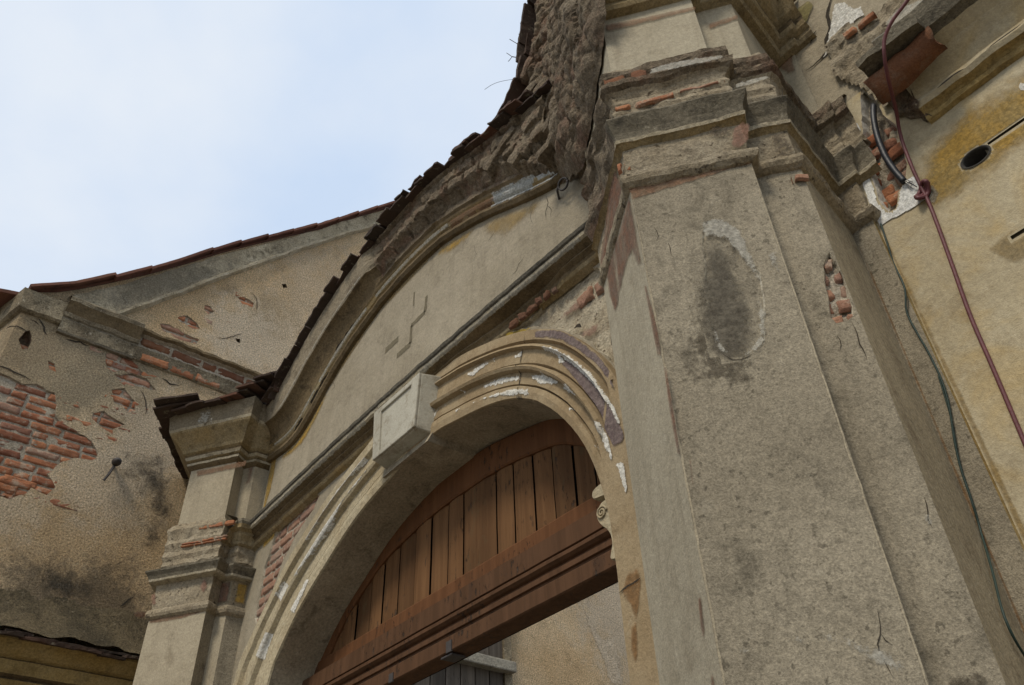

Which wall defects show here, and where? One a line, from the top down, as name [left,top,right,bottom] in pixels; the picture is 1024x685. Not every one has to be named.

peeling [824,0,922,56]
flaking render [856,90,925,225]
peeling [417,237,581,374]
flaking render [506,267,615,365]
water stain [701,249,750,357]
flaking render [823,252,853,323]
flaking render [0,305,252,511]
peeling [460,374,575,403]
peeling [542,346,620,423]
peeling [594,421,627,492]
flaking render [255,457,368,659]